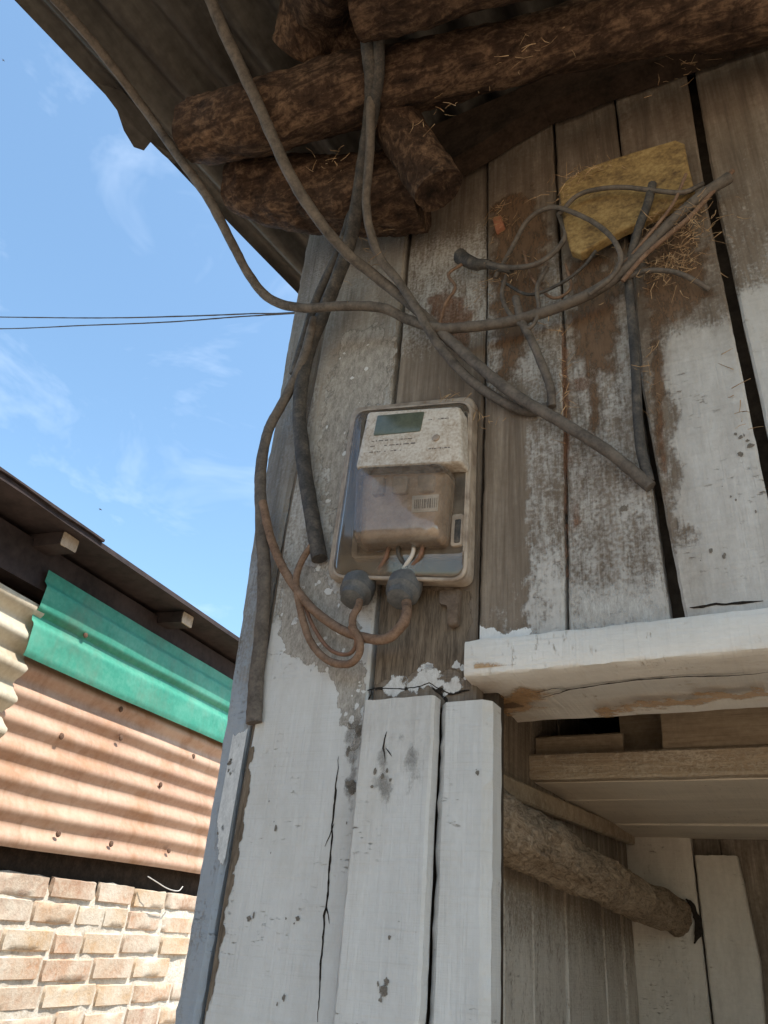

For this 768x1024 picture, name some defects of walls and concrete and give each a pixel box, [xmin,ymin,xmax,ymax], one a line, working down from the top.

damp [488,193,550,382]
damp [566,255,623,432]
peeling [277,564,533,795]
crack [317,757,339,1022]